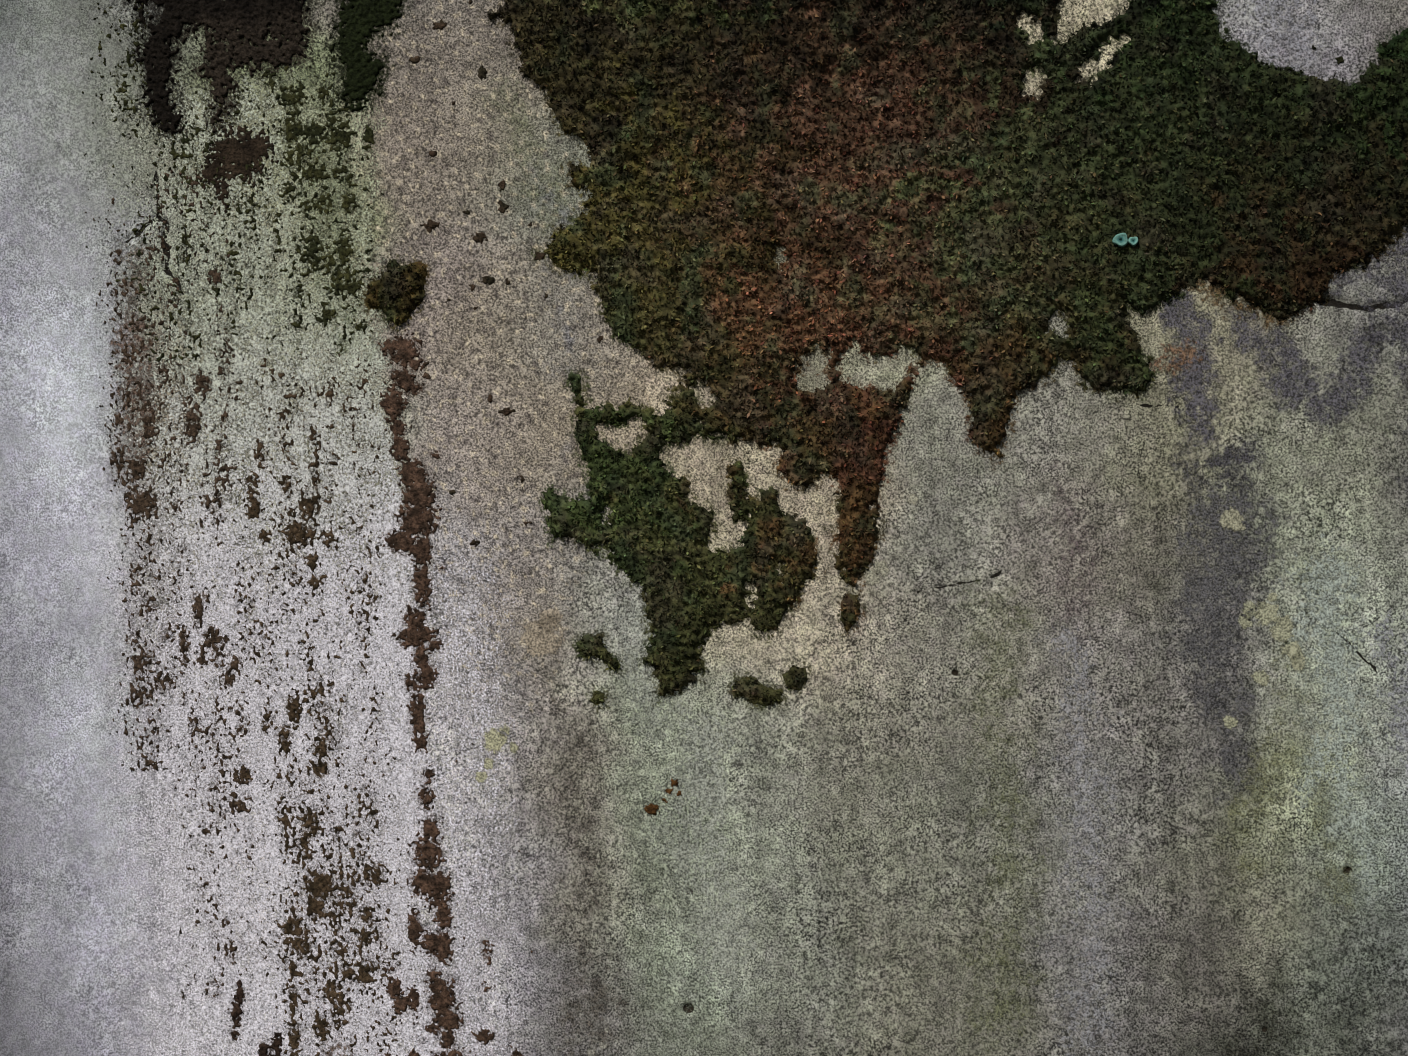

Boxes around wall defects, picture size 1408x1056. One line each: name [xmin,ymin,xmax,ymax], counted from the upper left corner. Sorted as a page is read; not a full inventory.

leakage [94,72,532,1056]
leakage [1157,226,1408,952]
crack [1317,298,1408,312]
leakage [1222,961,1298,1056]